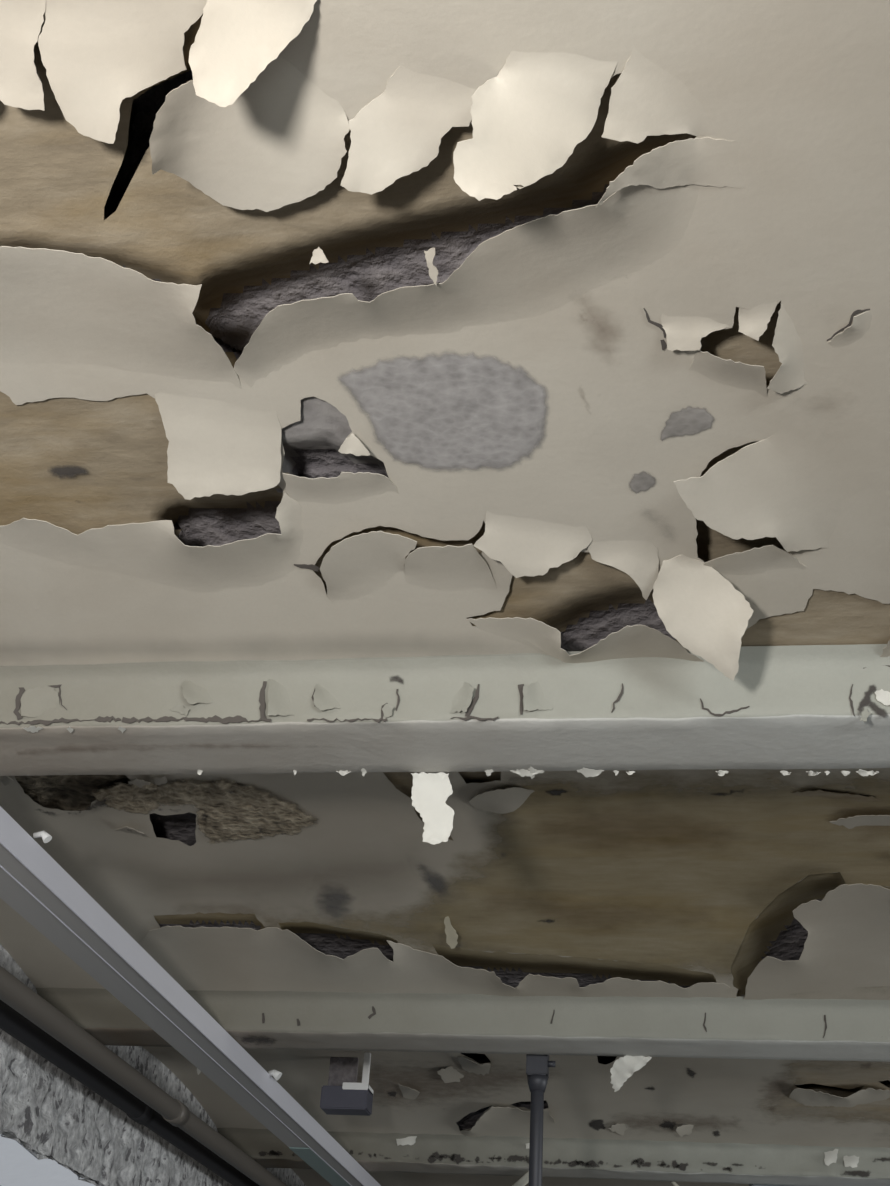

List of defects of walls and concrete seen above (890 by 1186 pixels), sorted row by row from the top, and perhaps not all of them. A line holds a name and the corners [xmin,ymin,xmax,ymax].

peeling [0,0,747,389]
peeling [660,301,808,397]
peeling [0,354,547,593]
peeling [313,431,890,681]
crack [13,684,67,720]
crack [259,679,295,721]
crack [449,681,480,717]
crack [518,681,553,715]
crack [611,683,623,713]
crack [700,698,750,716]
spalling [0,770,318,846]
peeling [140,767,890,1000]